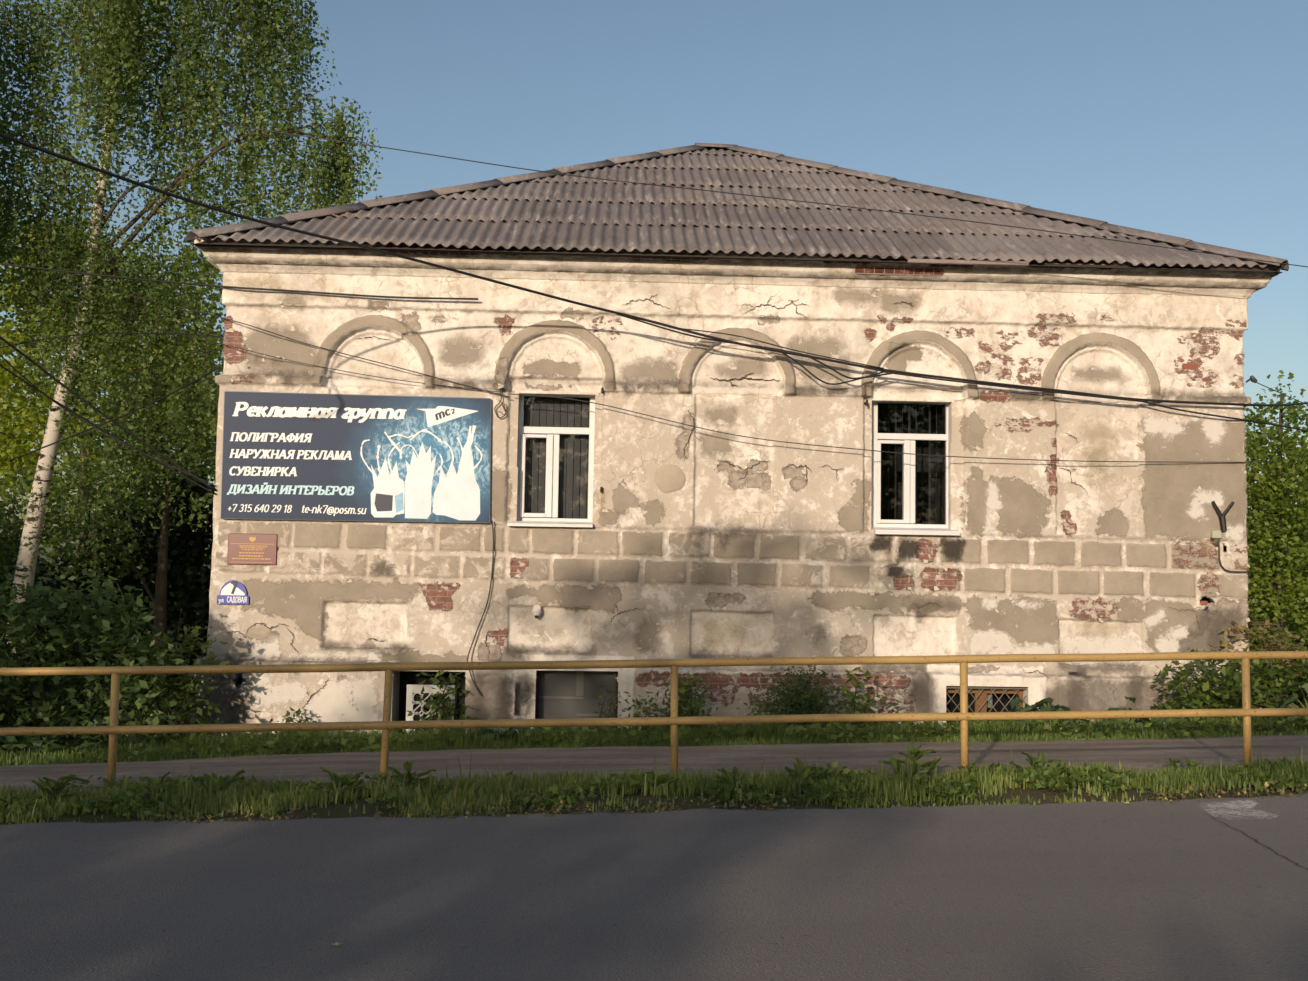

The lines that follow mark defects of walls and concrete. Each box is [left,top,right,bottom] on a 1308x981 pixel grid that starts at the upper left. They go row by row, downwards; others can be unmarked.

peeling [223,316,316,384]
spalling [368,300,448,335]
peeling [441,339,482,365]
flaking render [494,314,516,335]
peeling [492,357,582,391]
peeling [1071,367,1121,380]
flaking render [1174,316,1247,389]
spalling [674,406,808,491]
peeling [945,313,1077,539]
peeling [808,414,1250,652]
peeling [241,577,460,660]
flaking render [635,633,915,723]